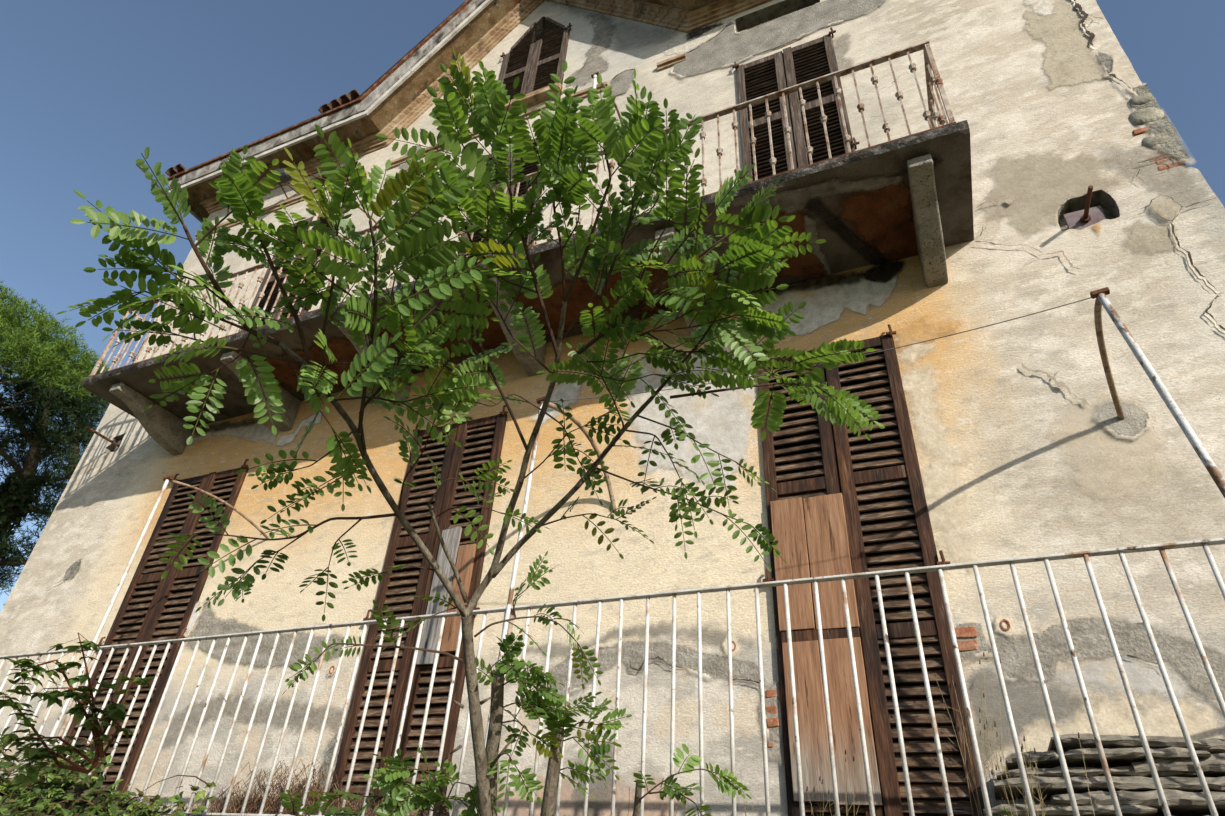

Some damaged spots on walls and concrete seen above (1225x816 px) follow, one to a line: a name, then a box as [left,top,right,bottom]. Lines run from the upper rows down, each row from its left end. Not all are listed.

spalling [670,0,885,78]
crack [1070,0,1102,49]
spalling [610,69,636,96]
spalling [1126,83,1195,171]
leakage [985,154,1119,233]
crack [1131,155,1225,333]
peeling [756,272,899,335]
peeling [630,353,755,489]